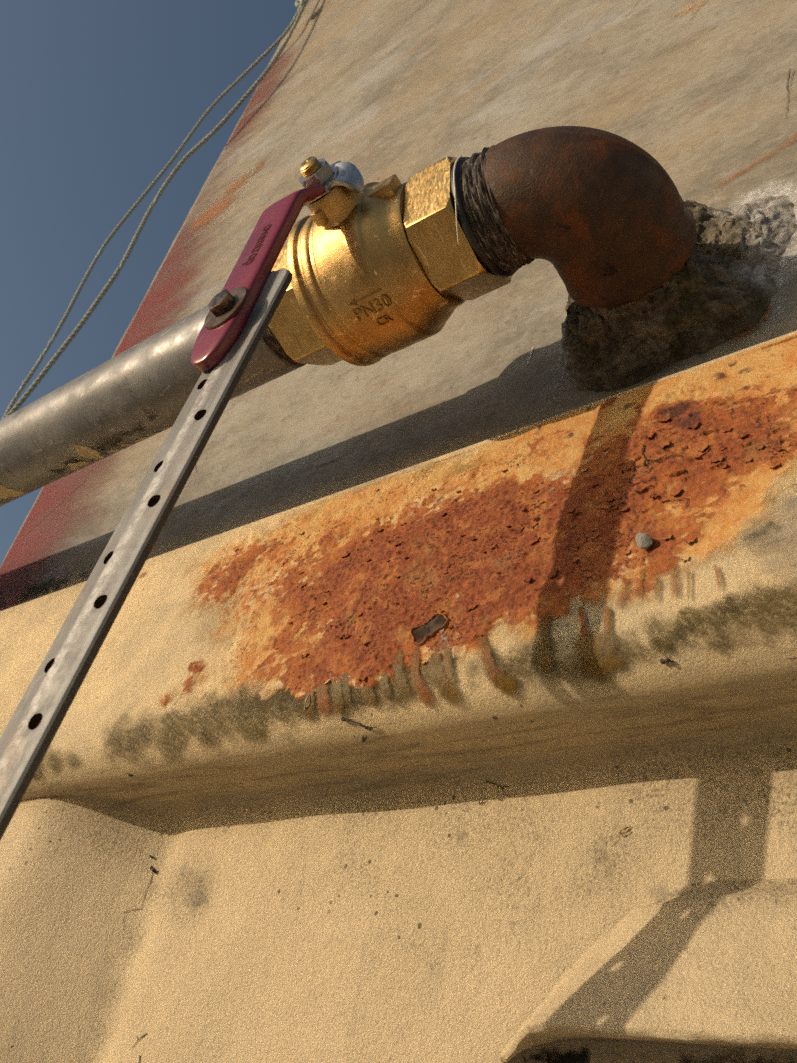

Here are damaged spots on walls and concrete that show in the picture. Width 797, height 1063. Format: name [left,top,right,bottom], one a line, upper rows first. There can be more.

damp [741,182,797,281]
rust [304,647,458,719]
rust [478,635,517,697]
rust [538,615,552,669]
rust [575,569,643,681]
damp [524,1048,589,1063]